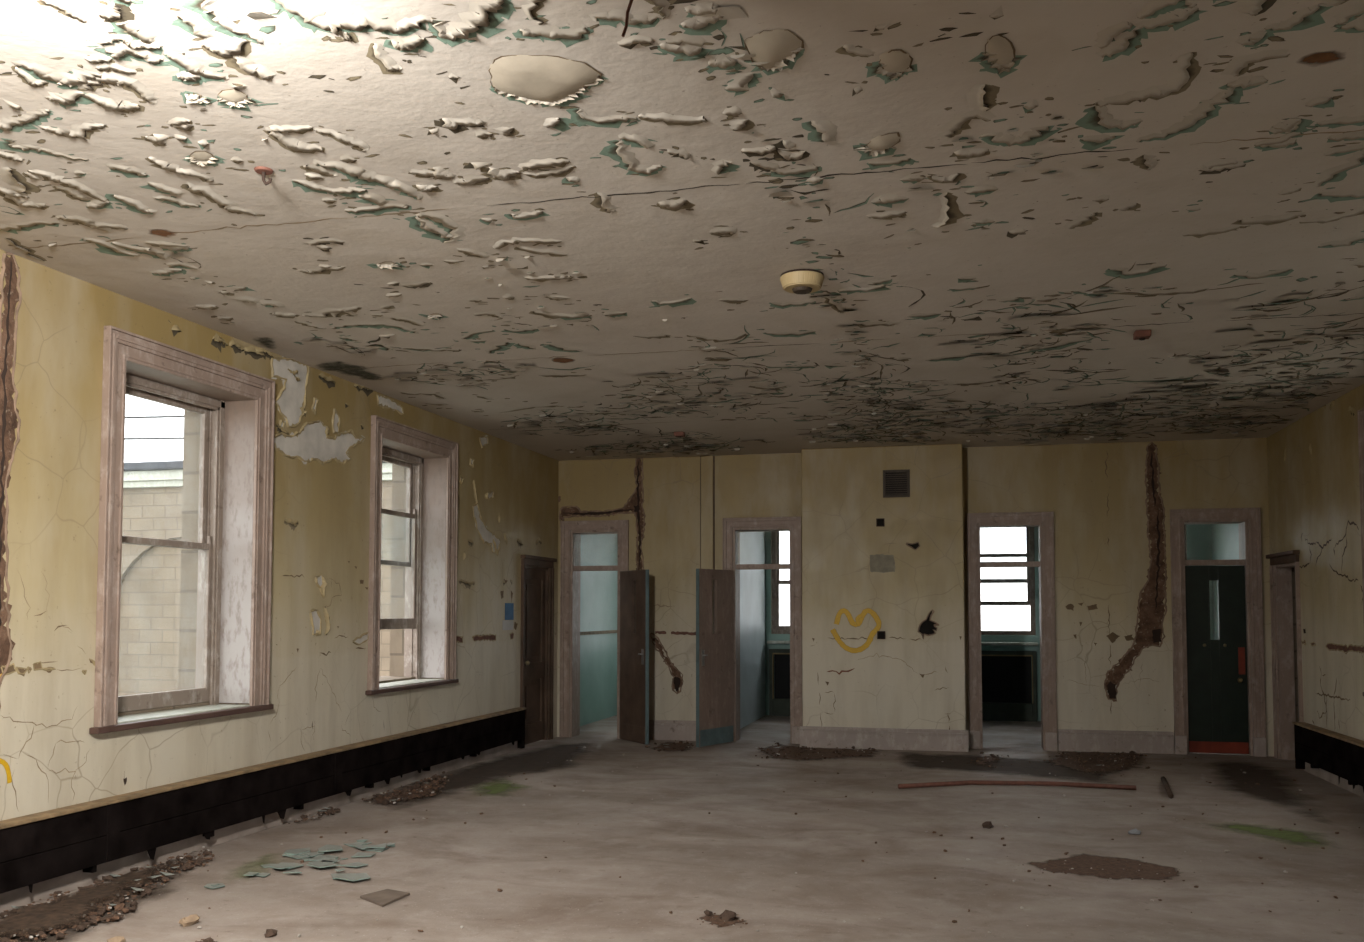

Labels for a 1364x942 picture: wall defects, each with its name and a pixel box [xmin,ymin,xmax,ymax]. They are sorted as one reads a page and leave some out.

peeling [0,0,1364,702]